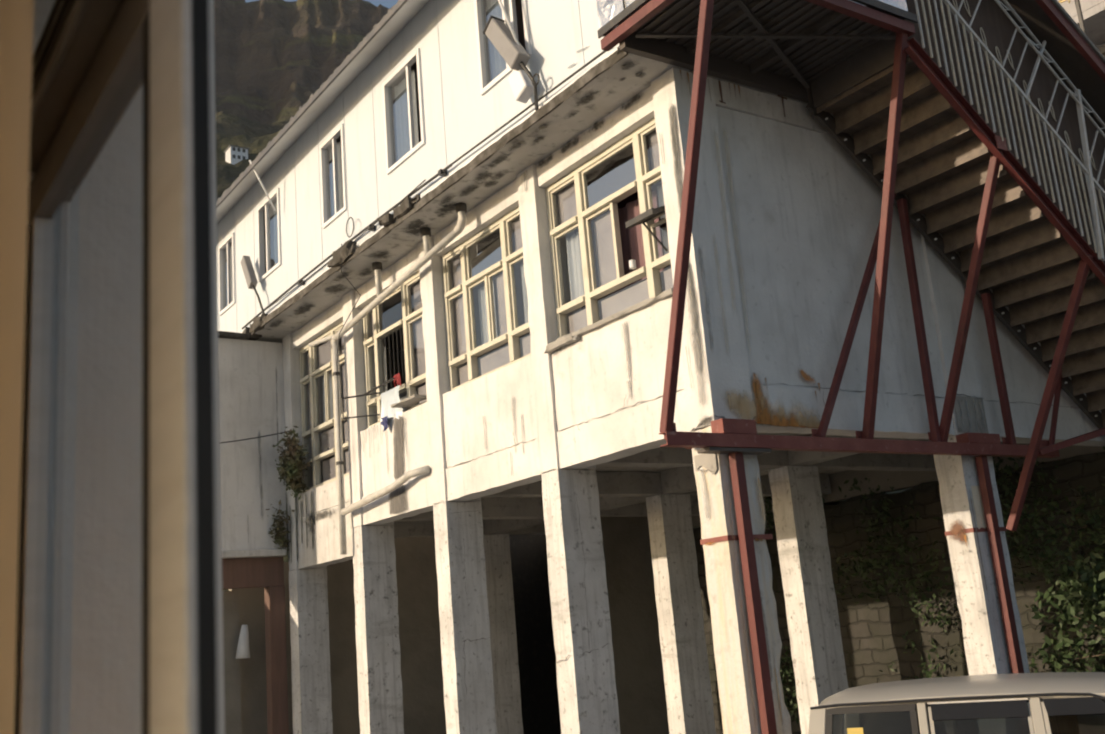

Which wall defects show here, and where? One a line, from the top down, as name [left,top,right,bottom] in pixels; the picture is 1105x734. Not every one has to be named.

water stain [569,91,598,118]
water stain [437,124,548,217]
water stain [538,137,579,167]
water stain [659,105,682,211]
water stain [406,220,427,235]
water stain [325,252,388,294]
corrosion [728,373,820,428]
corrosion [950,522,967,542]